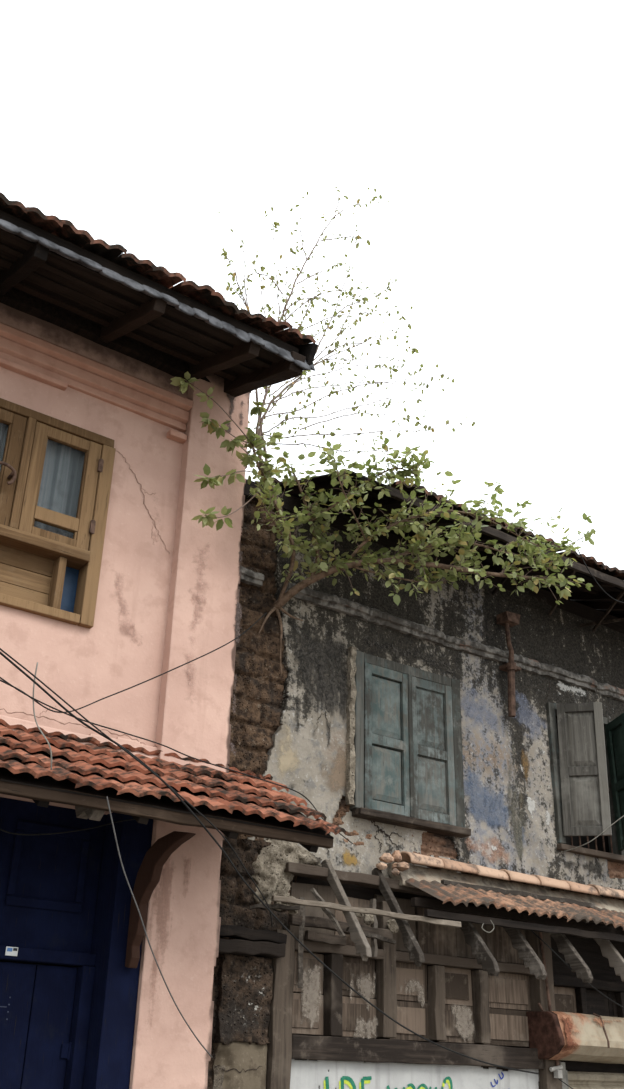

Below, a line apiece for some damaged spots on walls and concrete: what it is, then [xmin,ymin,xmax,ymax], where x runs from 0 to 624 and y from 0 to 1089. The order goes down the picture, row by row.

crack [119,452,166,549]
leakage [294,624,348,744]
flaking render [249,838,322,911]
spalling [332,796,372,847]
spalling [412,832,508,865]
leakage [505,768,525,858]
peeling [527,797,550,825]
spalling [607,861,624,879]